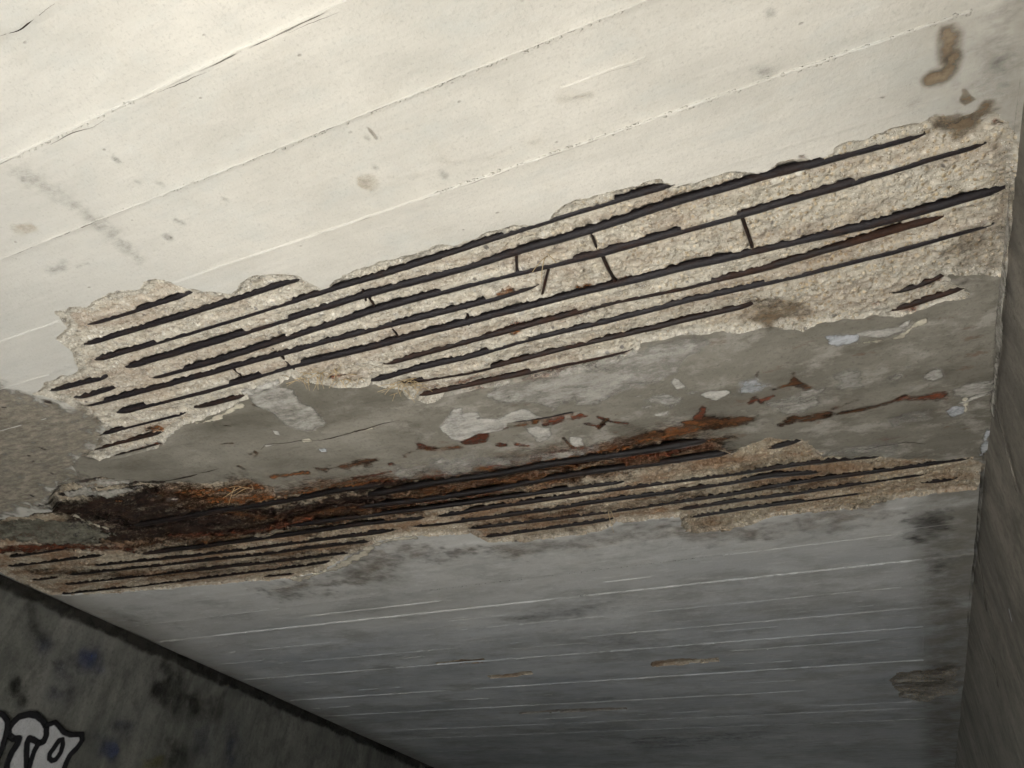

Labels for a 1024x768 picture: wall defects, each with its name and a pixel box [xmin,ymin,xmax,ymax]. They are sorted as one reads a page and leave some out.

water stain [922,26,961,86]
spalling [32,89,1019,461]
rust [747,373,812,404]
rust [777,391,947,427]
rust [0,406,754,579]
spalling [0,437,985,595]
spalling [889,663,962,702]